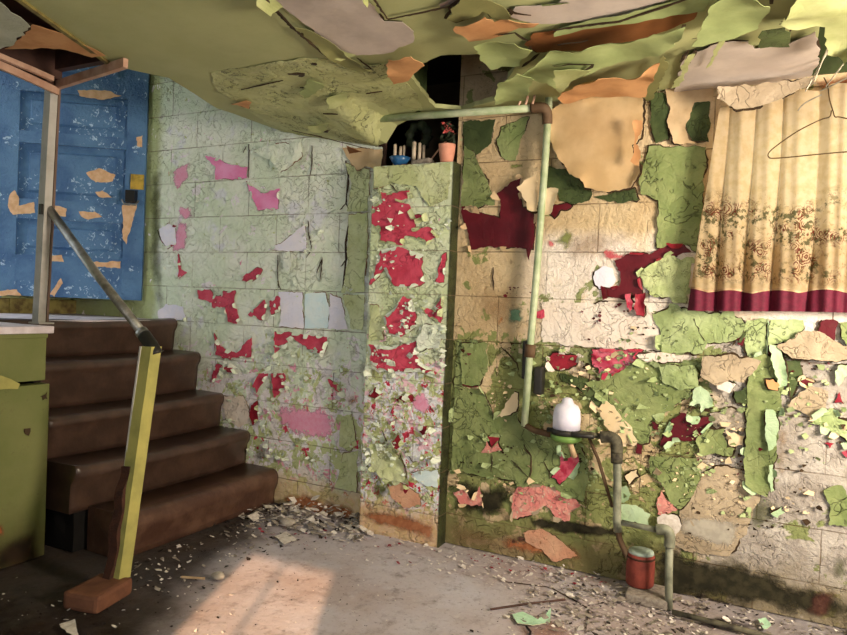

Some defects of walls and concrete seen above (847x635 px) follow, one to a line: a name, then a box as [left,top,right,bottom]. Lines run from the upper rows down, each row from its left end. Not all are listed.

peeling [78,90,121,100]
peeling [86,168,115,198]
peeling [8,190,35,215]
peeling [79,211,102,220]
peeling [122,205,137,244]
peeling [158,0,847,556]
water stain [0,536,35,568]
spalling [509,529,577,577]
water stain [655,550,819,613]
water stain [826,598,847,613]